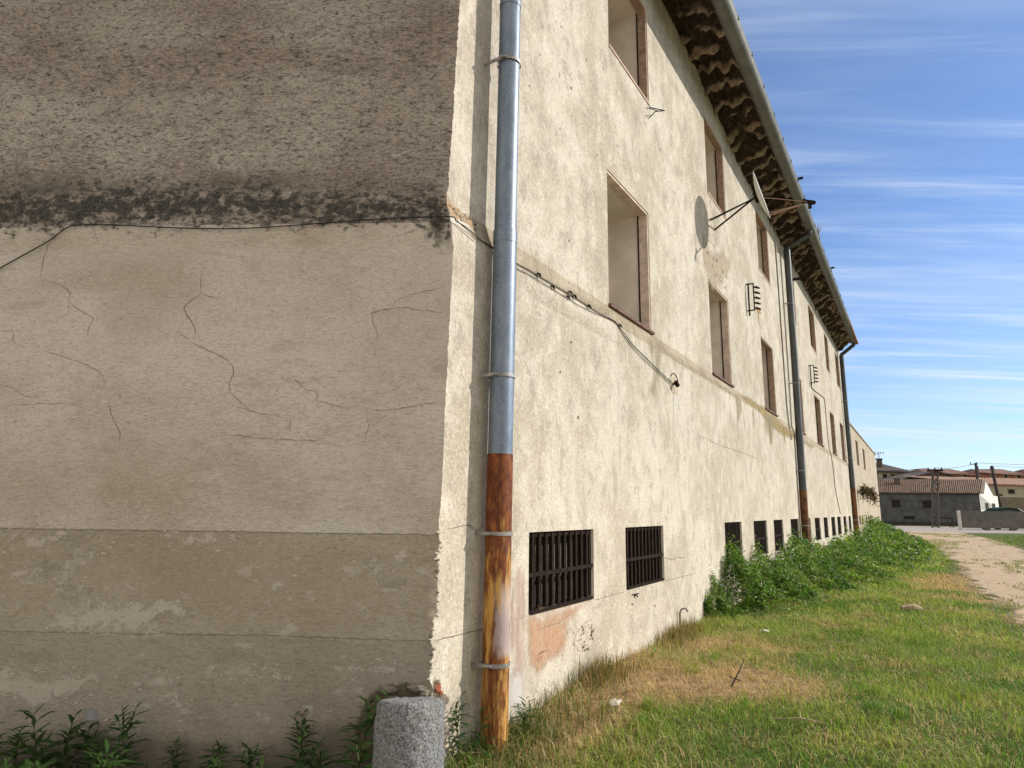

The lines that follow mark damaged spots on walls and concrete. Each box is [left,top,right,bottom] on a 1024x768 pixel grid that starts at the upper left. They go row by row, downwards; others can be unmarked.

damp [0,176,451,245]
crack [40,245,120,440]
crack [181,269,326,441]
rust [480,453,524,761]
peeling [529,607,595,670]
rust [799,490,811,553]